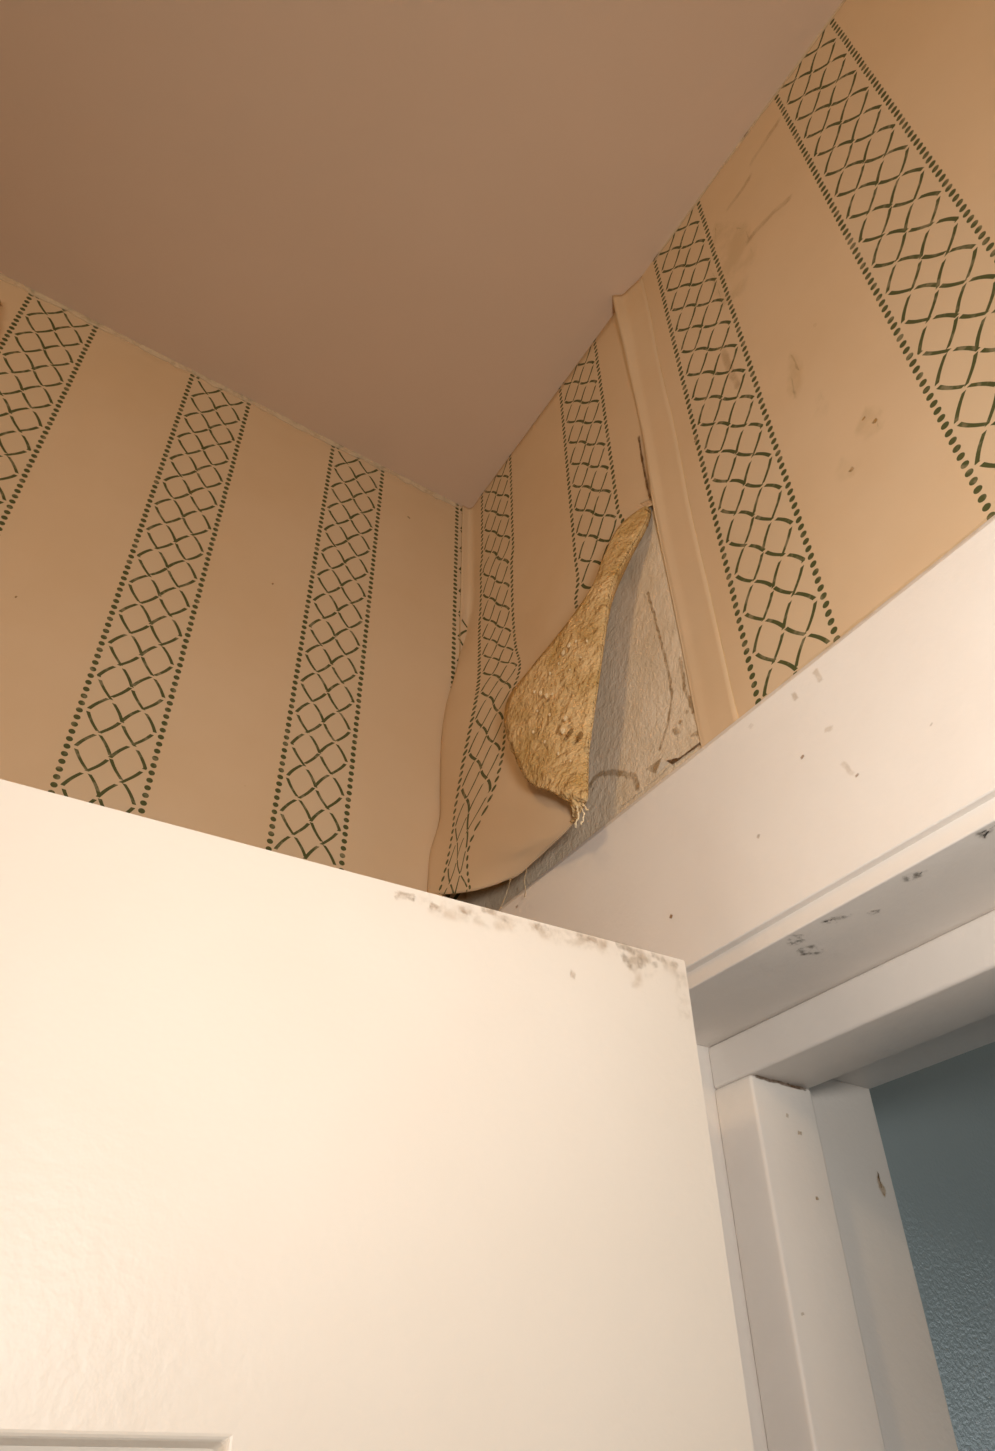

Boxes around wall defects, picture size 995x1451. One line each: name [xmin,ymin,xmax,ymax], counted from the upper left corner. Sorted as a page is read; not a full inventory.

flaking render [466,506,700,910]